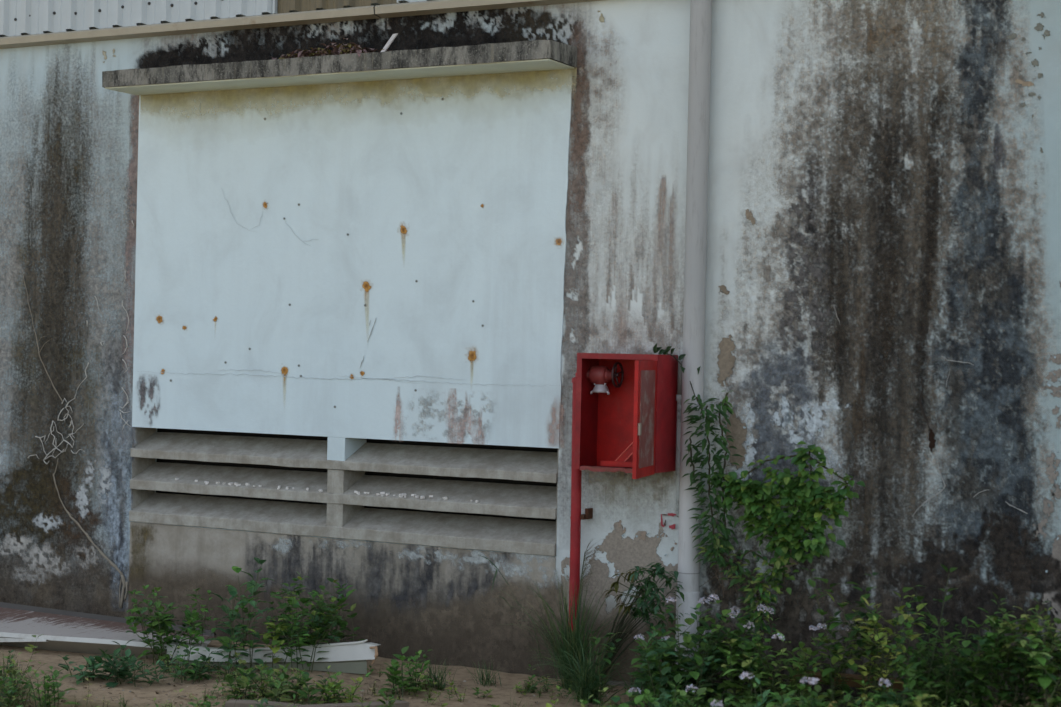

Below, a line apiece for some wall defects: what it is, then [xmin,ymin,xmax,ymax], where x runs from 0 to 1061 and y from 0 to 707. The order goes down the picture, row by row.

leakage [0,59,160,588]
leakage [137,5,684,436]
peeling [717,335,736,387]
leakage [708,0,1061,707]
peeling [1042,354,1061,429]
peeling [561,520,678,682]
peeling [1033,453,1061,659]